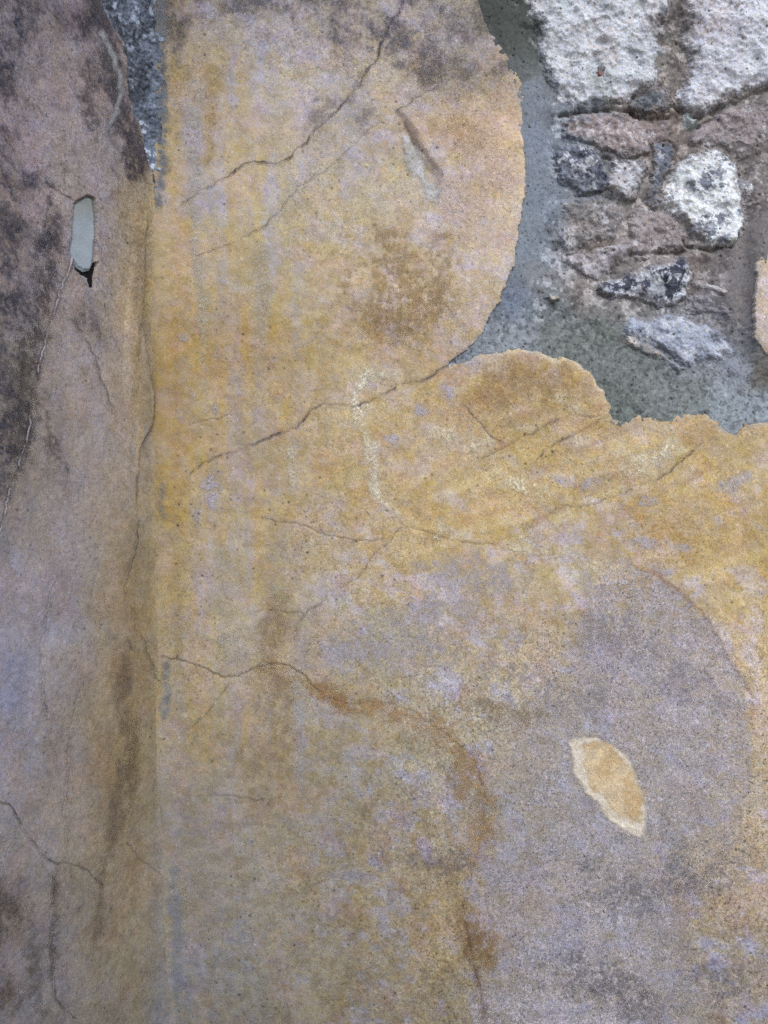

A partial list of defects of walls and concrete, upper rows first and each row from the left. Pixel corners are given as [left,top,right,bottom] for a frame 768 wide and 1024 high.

crack [366,7,402,71]
crack [181,96,349,204]
flaking render [450,0,768,435]
spalling [74,263,95,288]
crack [351,364,449,407]
crack [257,406,320,443]
peeling [469,563,751,1024]